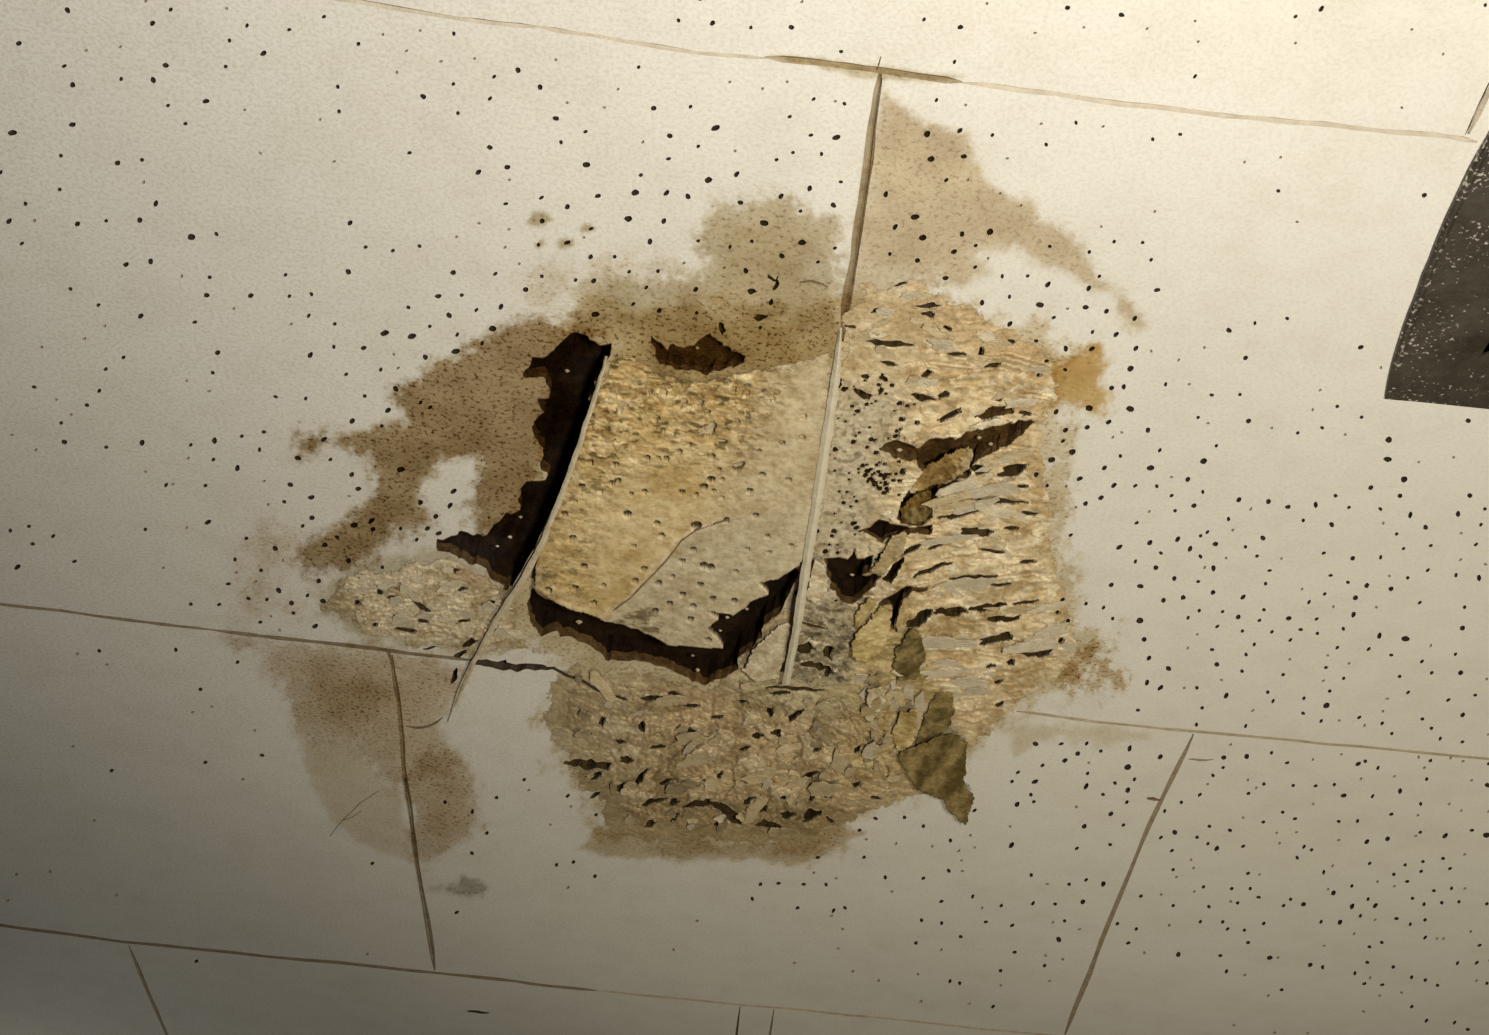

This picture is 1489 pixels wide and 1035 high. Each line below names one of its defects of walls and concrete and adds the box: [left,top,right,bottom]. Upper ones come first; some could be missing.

spalling [320,558,547,656]
leakage [298,216,854,626]
spalling [540,279,1078,845]
leakage [886,411,1022,549]